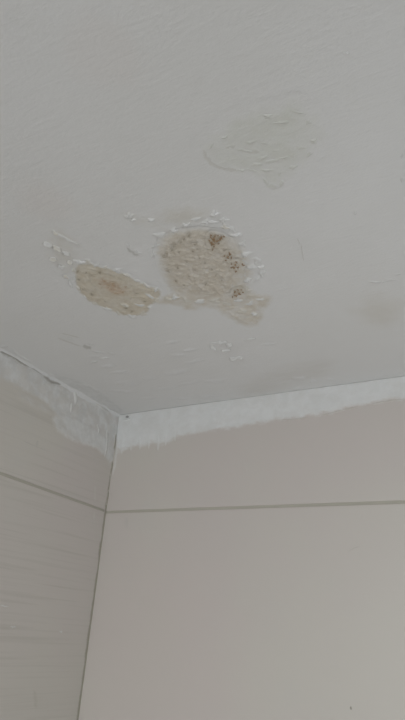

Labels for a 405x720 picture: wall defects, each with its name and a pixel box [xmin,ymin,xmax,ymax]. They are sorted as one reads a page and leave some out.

damp [33,197,280,330]